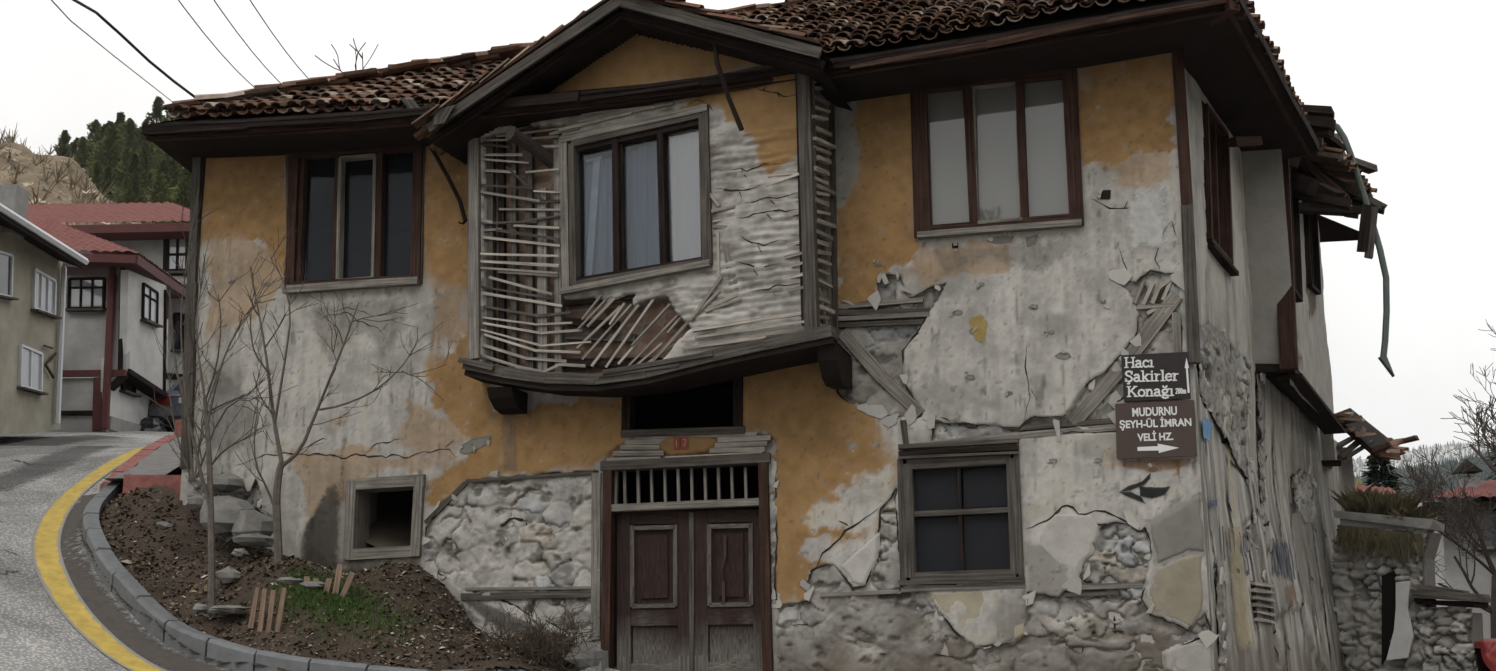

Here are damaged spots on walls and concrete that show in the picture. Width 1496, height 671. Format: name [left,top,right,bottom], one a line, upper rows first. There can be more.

spalling [1096,187,1111,199]
crack [1092,199,1130,209]
crack [1119,221,1176,270]
peeling [836,260,1274,581]
peeling [187,463,273,515]
peeling [422,470,599,645]
crack [815,509,877,568]
peeling [769,458,1229,671]
crack [1026,505,1127,529]